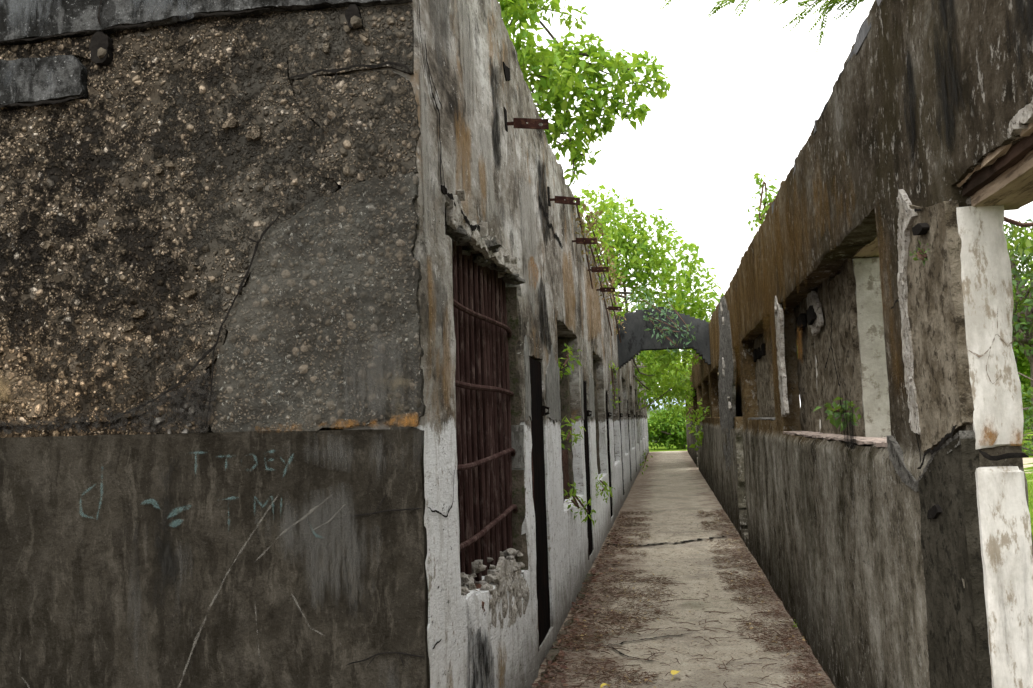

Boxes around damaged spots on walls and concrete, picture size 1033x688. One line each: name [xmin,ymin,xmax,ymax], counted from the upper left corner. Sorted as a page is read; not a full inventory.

spalling [441,185,526,285]
crack [916,425,957,469]
crack [979,450,1029,461]
spalling [460,548,530,629]